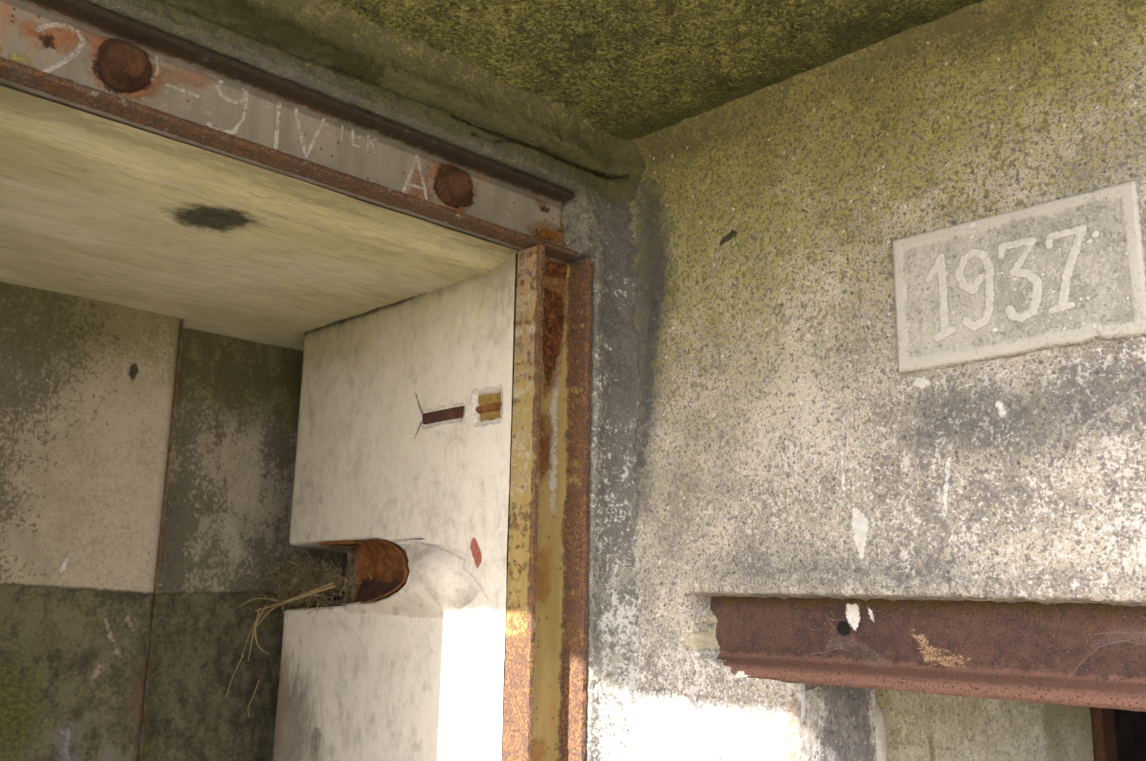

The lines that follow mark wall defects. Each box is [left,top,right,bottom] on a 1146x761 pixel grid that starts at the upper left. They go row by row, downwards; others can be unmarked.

corrosion [21,23,163,99]
corrosion [410,163,475,213]
corrosion [531,199,564,247]
corrosion [542,258,569,397]
corrosion [539,415,553,478]
leakage [272,662,317,761]